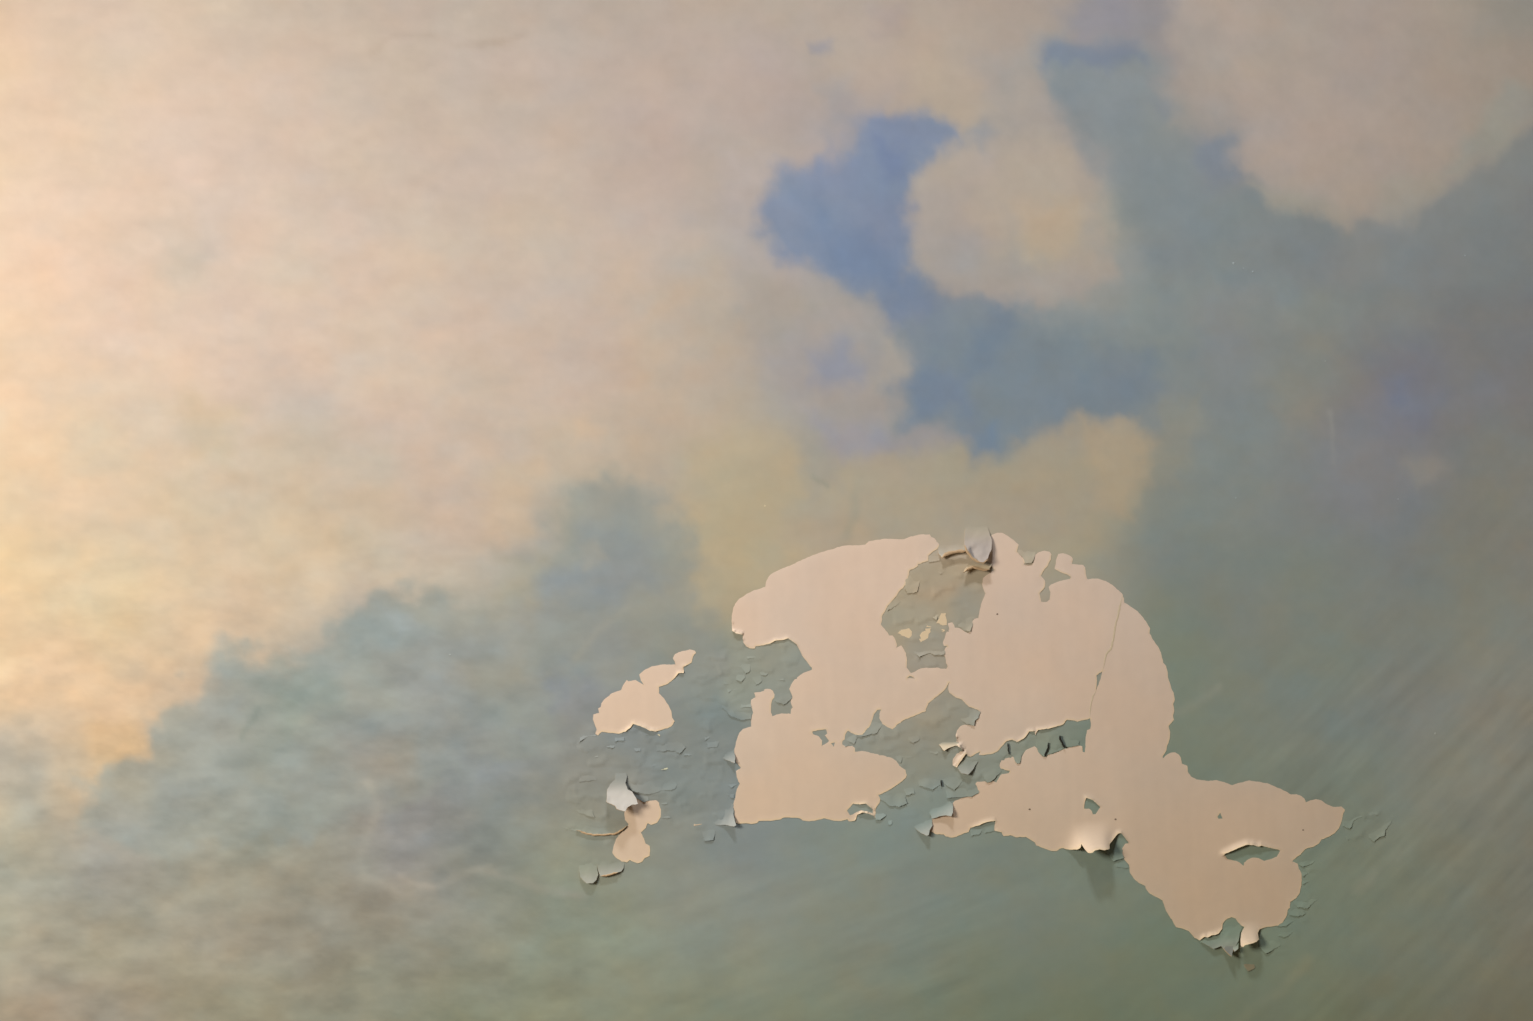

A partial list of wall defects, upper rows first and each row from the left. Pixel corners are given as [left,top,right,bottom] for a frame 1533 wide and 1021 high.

peeling [561,526,1345,971]